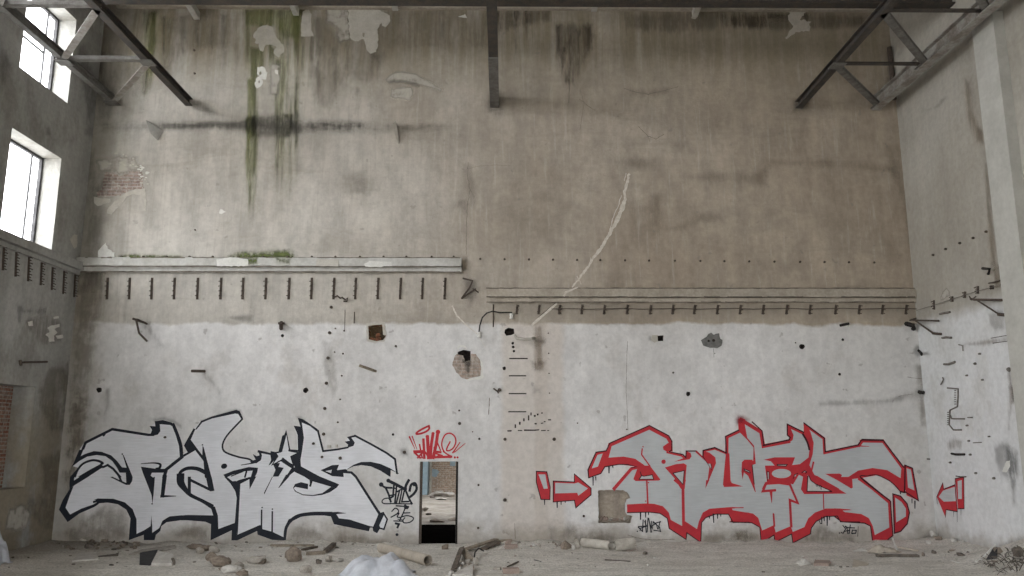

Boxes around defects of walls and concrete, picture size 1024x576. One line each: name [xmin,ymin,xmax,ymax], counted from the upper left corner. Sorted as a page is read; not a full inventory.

flaking render [253,25,284,94]
flaking render [327,10,390,54]
damp [246,12,302,172]
spalling [94,153,150,215]
crack [531,173,631,326]
spalling [366,322,387,343]
spalling [452,345,484,381]
spalling [598,490,632,523]